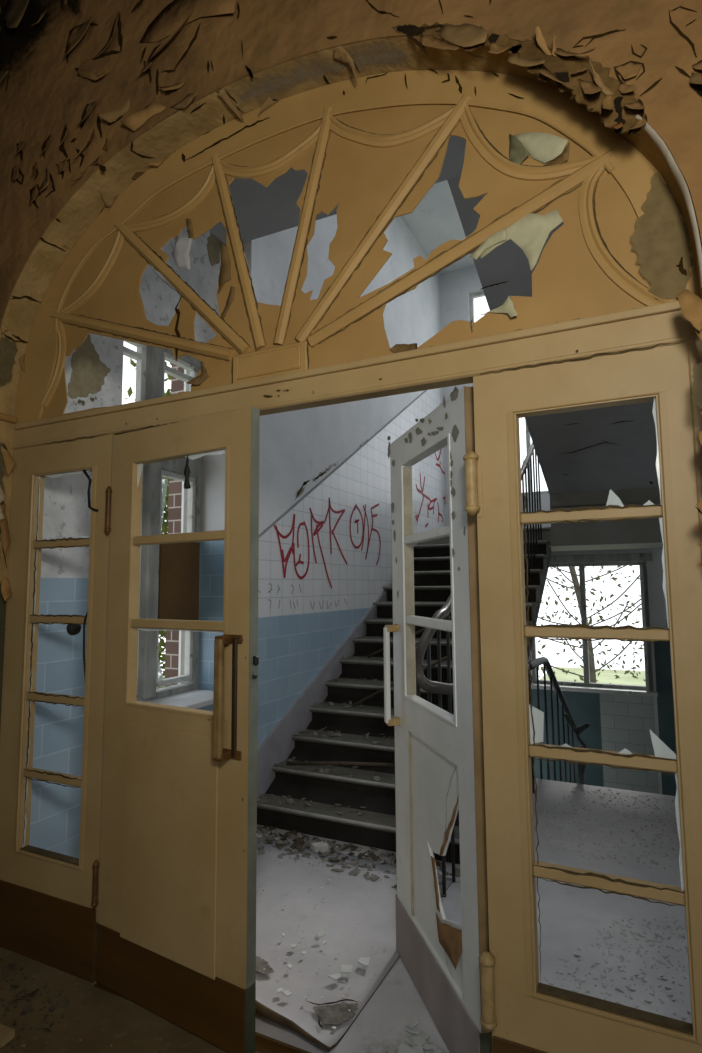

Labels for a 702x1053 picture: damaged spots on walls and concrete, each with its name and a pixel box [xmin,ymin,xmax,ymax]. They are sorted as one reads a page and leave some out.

peeling [0,0,47,37]
crack [366,0,398,17]
peeling [11,0,244,208]
peeling [392,22,647,137]
peeling [675,62,702,97]
spalling [631,173,702,416]
peeling [67,334,110,406]
peeling [404,387,459,497]
peeling [0,443,16,601]